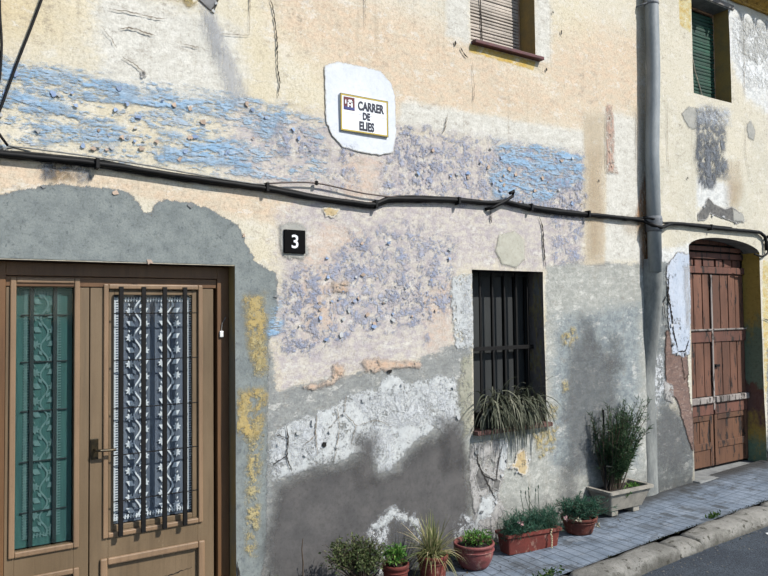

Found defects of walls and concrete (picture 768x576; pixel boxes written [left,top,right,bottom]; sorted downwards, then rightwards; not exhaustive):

crack [271,2,280,99]
peeling [0,56,360,190]
peeling [322,205,340,218]
peeling [383,126,587,263]
spalling [698,197,745,224]
peeling [244,222,474,437]
flaking render [654,251,695,451]
peeling [237,388,266,555]
crack [274,394,391,471]
damp [267,374,471,576]
crack [477,444,503,498]
spalling [455,439,531,538]